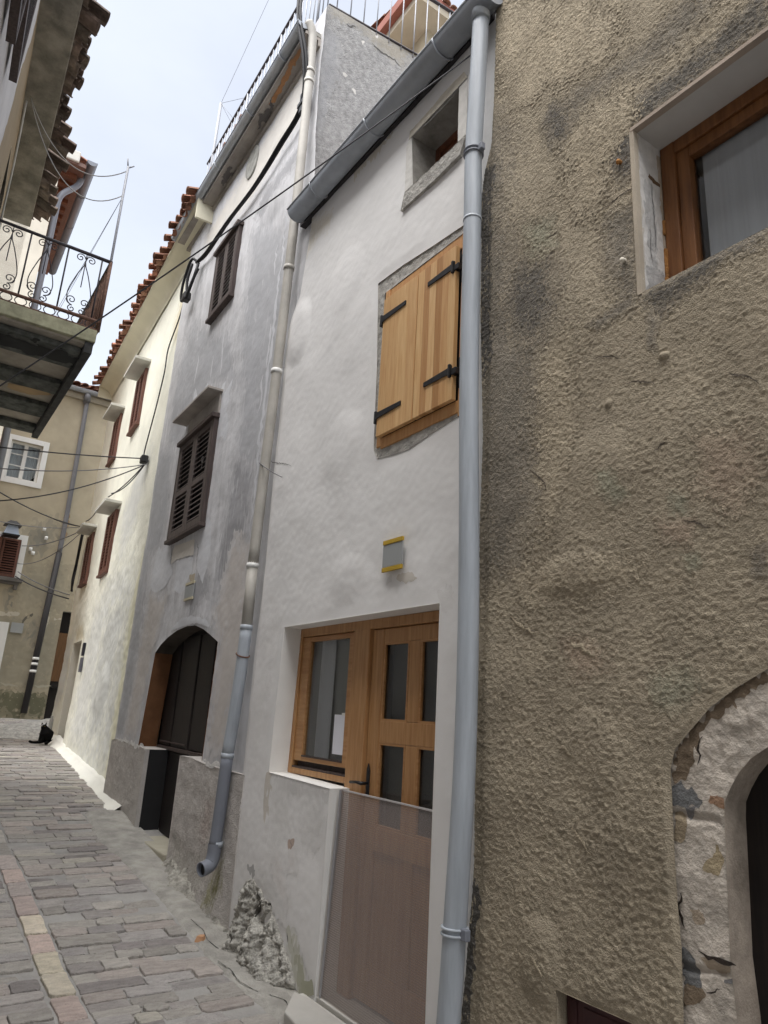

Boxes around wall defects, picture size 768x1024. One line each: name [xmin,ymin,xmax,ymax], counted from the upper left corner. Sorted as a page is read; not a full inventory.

water stain [479,0,768,605]
spalling [702,845,724,876]